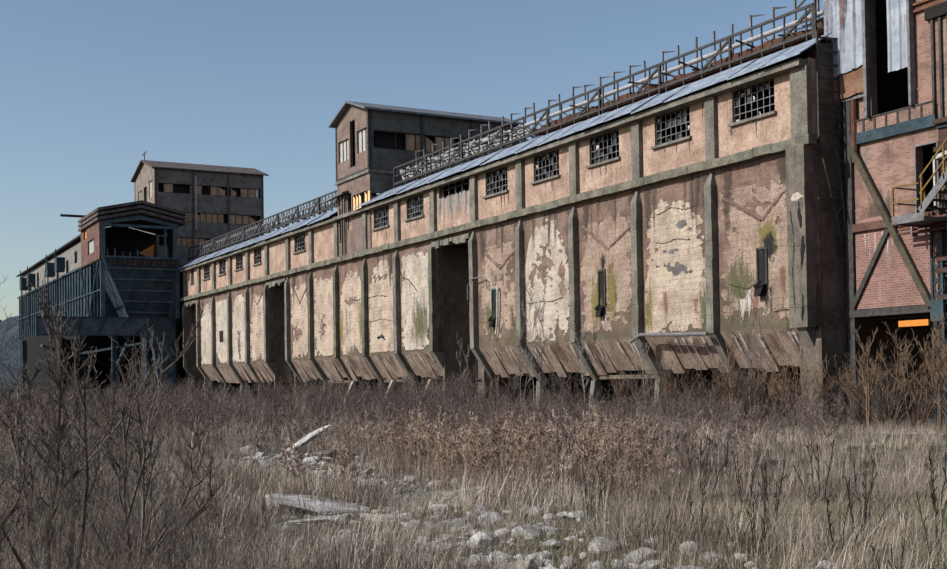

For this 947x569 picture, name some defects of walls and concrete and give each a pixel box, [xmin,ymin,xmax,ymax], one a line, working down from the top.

corrosion [824,0,854,38]
peeling [291,251,429,358]
peeling [480,218,569,342]
peeling [581,211,632,334]
peeling [645,199,706,333]
peeling [719,178,805,320]